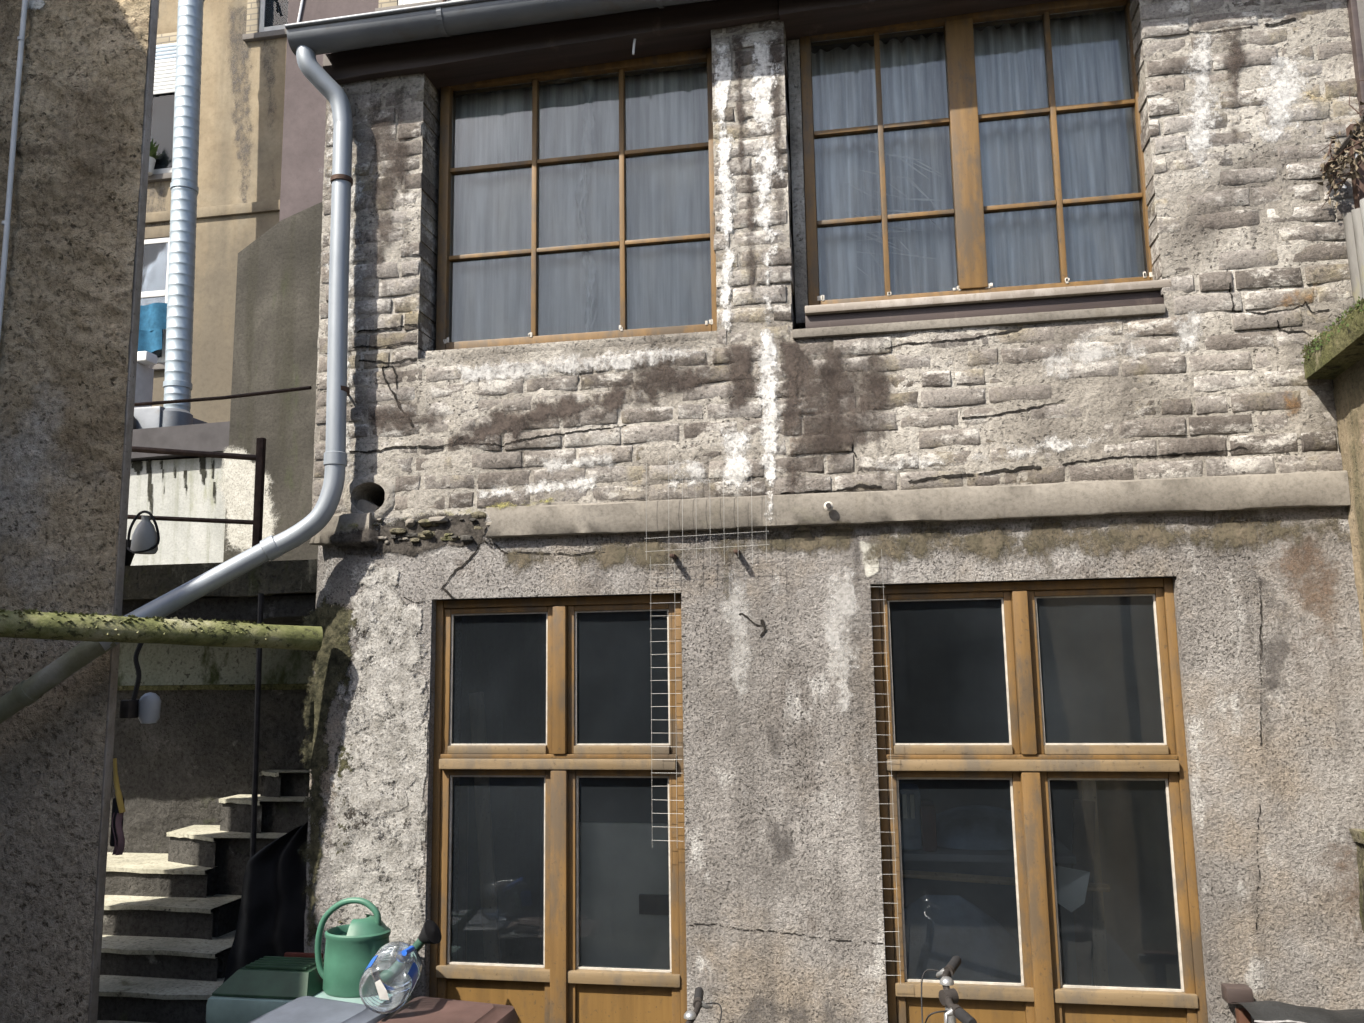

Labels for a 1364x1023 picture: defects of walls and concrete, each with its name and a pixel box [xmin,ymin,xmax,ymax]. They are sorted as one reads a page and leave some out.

leakage [370,400,442,430]
crack [349,324,626,453]
leakage [448,349,710,446]
leakage [575,26,1350,708]
leakage [131,457,216,514]
leakage [479,454,612,498]
crack [356,539,605,654]
leakage [506,549,545,573]